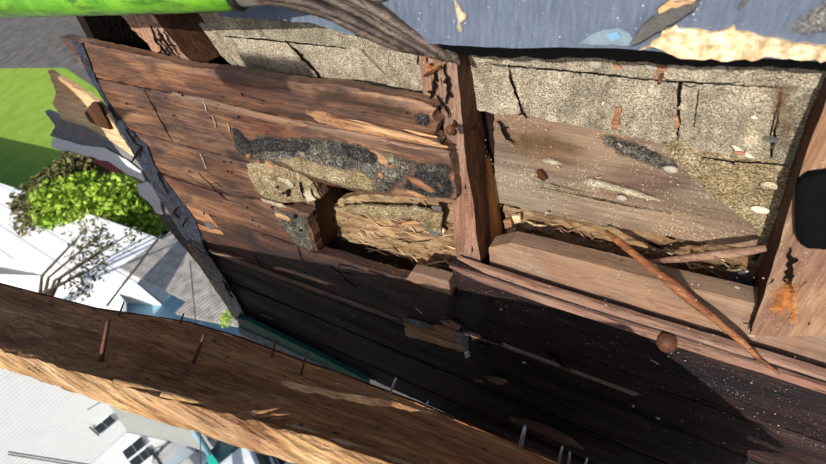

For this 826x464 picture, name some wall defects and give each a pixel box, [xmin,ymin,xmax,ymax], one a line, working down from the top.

peeling [579,27,633,46]
peeling [639,24,826,63]
crack [490,64,789,166]
peeling [362,148,395,178]
spalling [245,154,321,221]
peeling [407,176,434,198]
peeling [403,317,481,358]